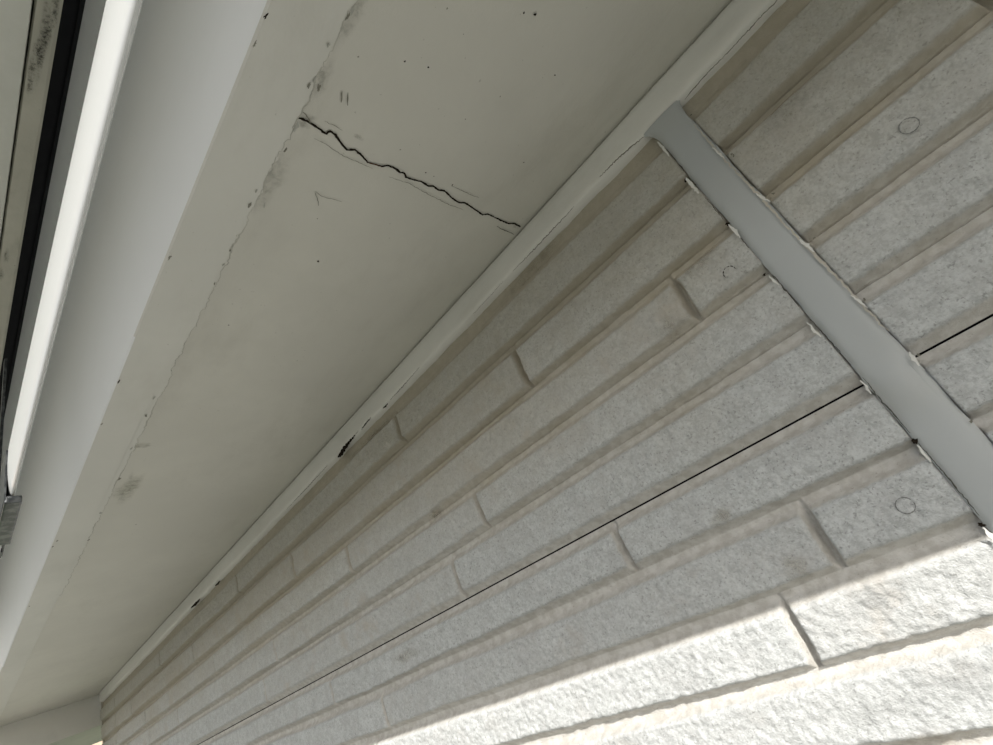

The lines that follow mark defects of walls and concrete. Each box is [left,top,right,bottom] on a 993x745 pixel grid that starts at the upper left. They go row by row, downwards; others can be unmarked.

crack [298,112,521,233]